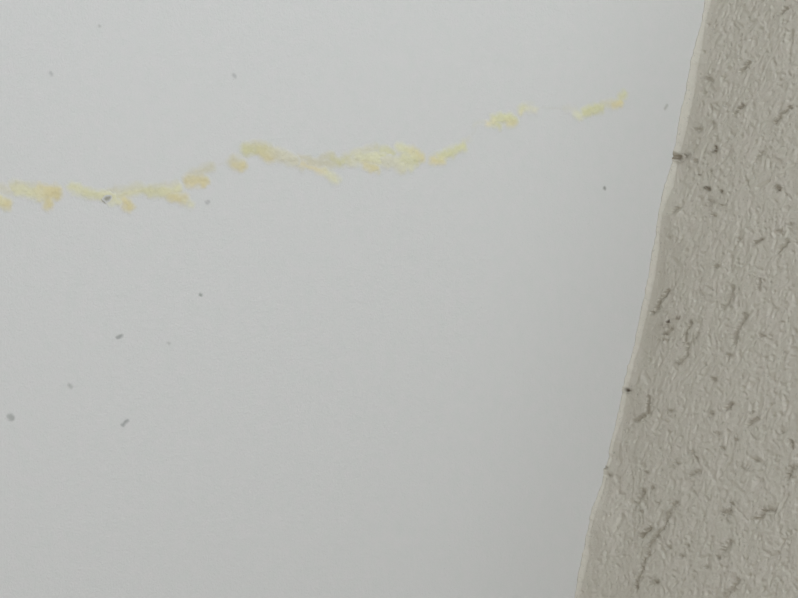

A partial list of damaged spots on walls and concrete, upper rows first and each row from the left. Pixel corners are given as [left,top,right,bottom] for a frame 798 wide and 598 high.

crack [0,87,631,216]